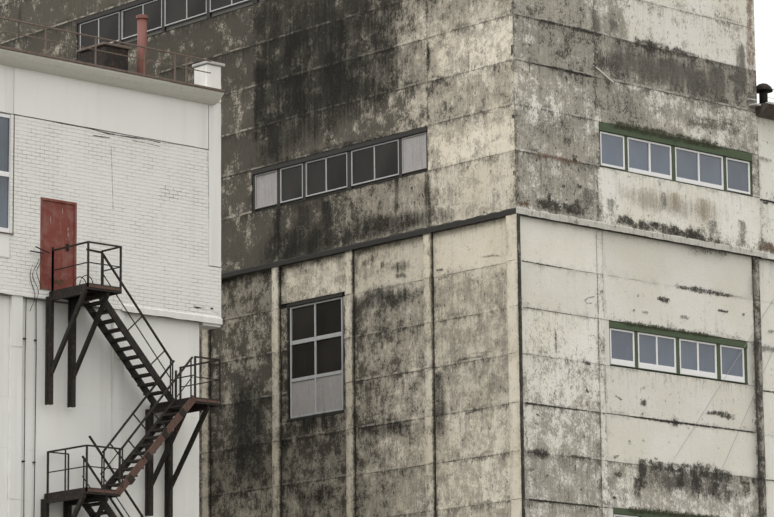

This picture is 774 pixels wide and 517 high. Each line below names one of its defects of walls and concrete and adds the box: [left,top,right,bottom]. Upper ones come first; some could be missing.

water stain [252,0,402,166]
water stain [611,37,725,98]
water stain [264,175,454,262]
water stain [537,185,594,216]
water stain [608,191,732,257]
water stain [364,256,409,307]
water stain [435,372,444,430]
water stain [628,333,774,517]